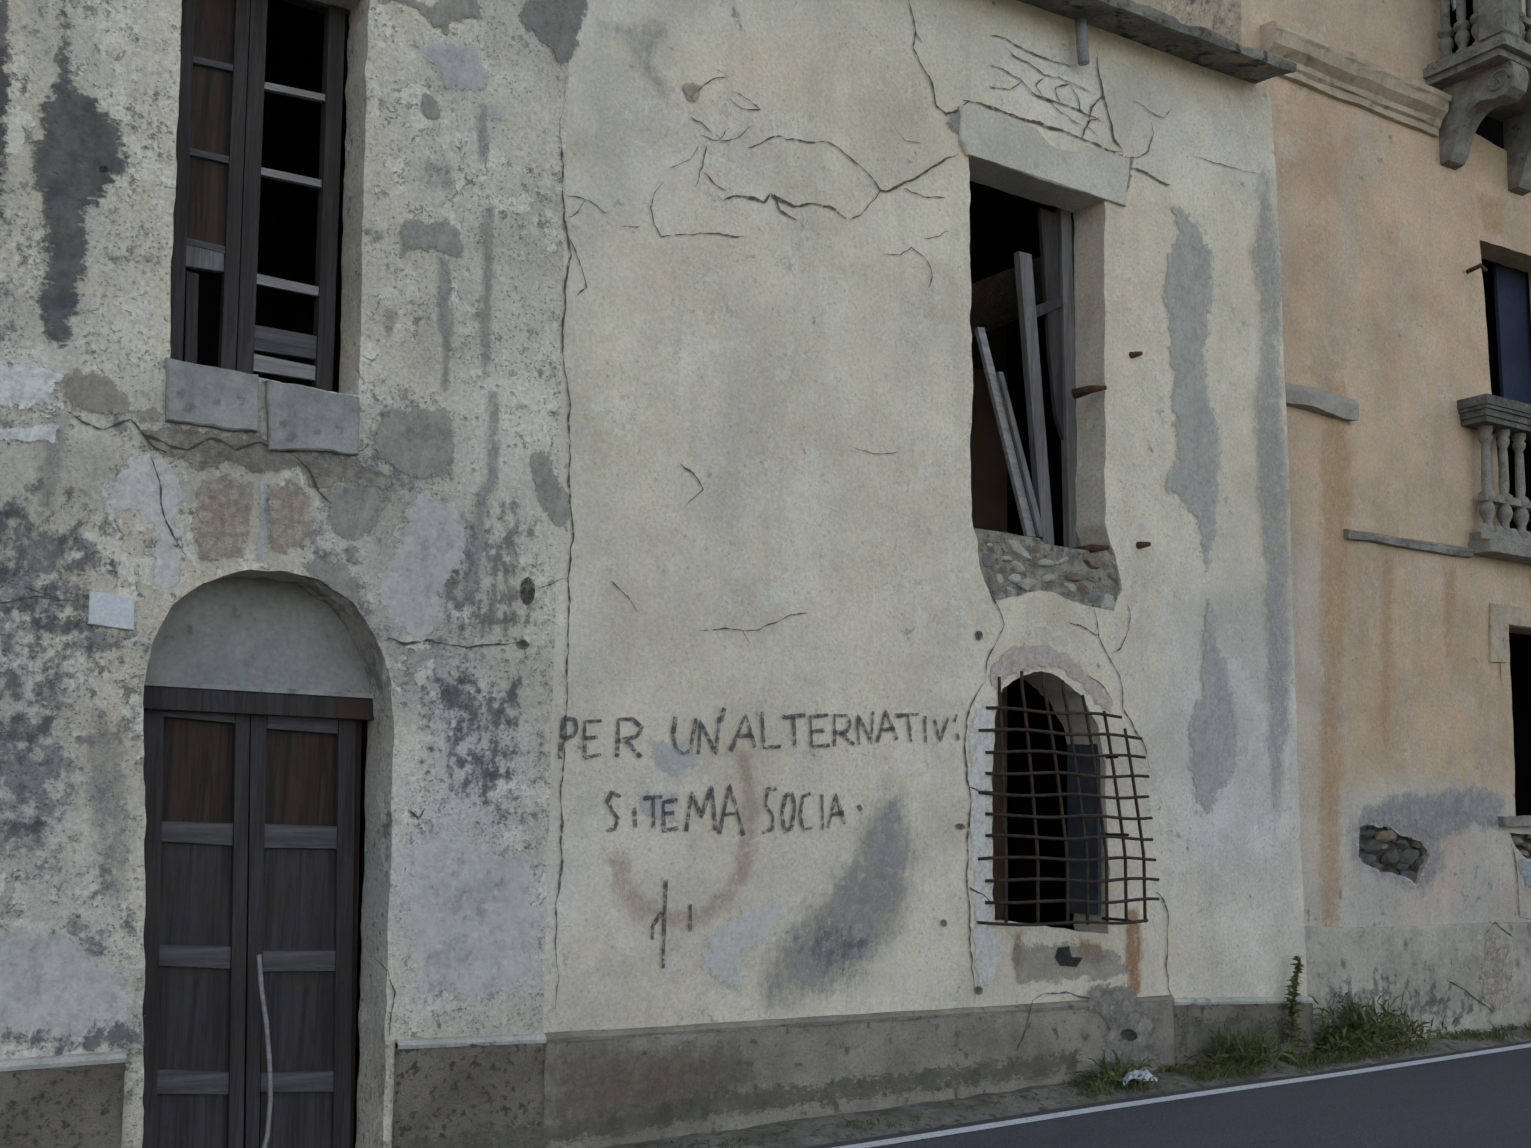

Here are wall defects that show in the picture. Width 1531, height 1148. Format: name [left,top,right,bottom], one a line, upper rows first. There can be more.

water stain [0,0,12,218]
water stain [29,0,130,349]
crack [908,0,1172,185]
water stain [0,415,123,859]
crack [64,409,330,557]
crack [541,69,958,1008]
spalling [974,528,1119,610]
crack [1069,605,1150,768]
crack [964,593,1005,991]
water stain [701,799,915,998]
crack [1156,892,1172,995]